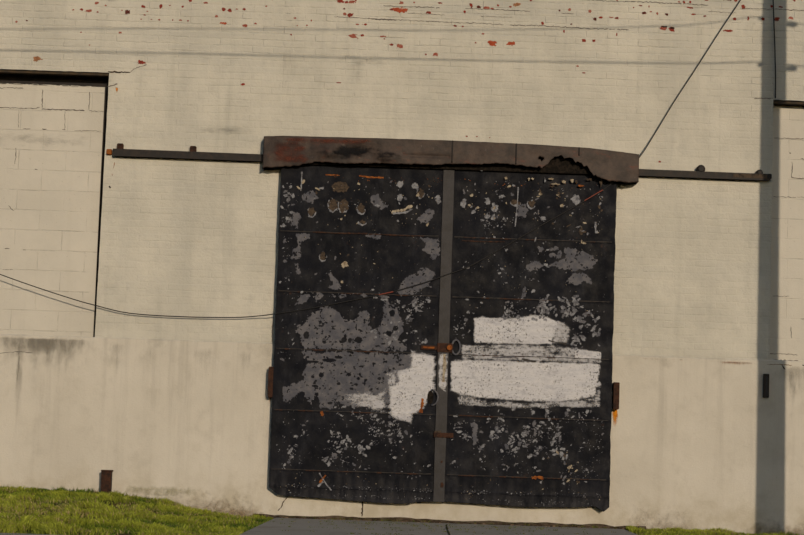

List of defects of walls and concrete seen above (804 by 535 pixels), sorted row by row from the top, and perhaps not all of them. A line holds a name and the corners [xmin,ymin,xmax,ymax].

peeling [337,0,367,39]
peeling [328,181,388,224]
peeling [396,181,425,201]
peeling [416,195,441,223]
peeling [511,199,536,218]
peeling [291,190,318,274]
peeling [397,237,441,295]
peeling [526,246,598,285]
peeling [282,272,415,409]